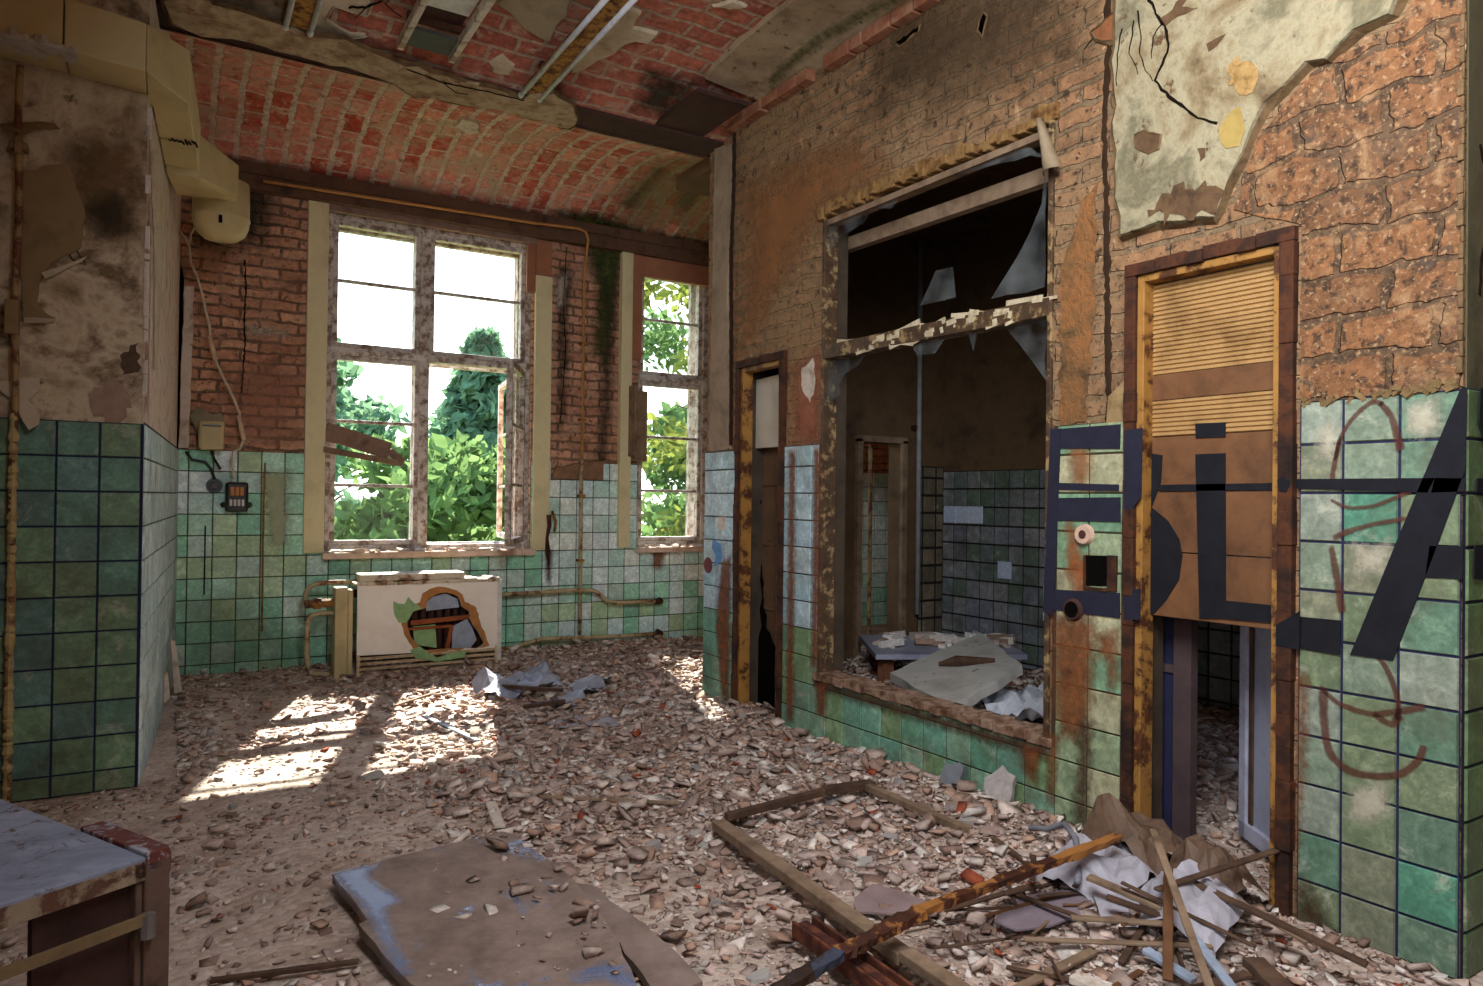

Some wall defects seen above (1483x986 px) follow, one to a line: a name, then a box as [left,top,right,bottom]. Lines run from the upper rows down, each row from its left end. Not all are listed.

leakage [71,138,139,240]
spalling [209,0,538,121]
spalling [552,89,581,130]
crack [1084,0,1217,422]
spalling [1057,0,1467,426]
rust [786,448,1116,824]